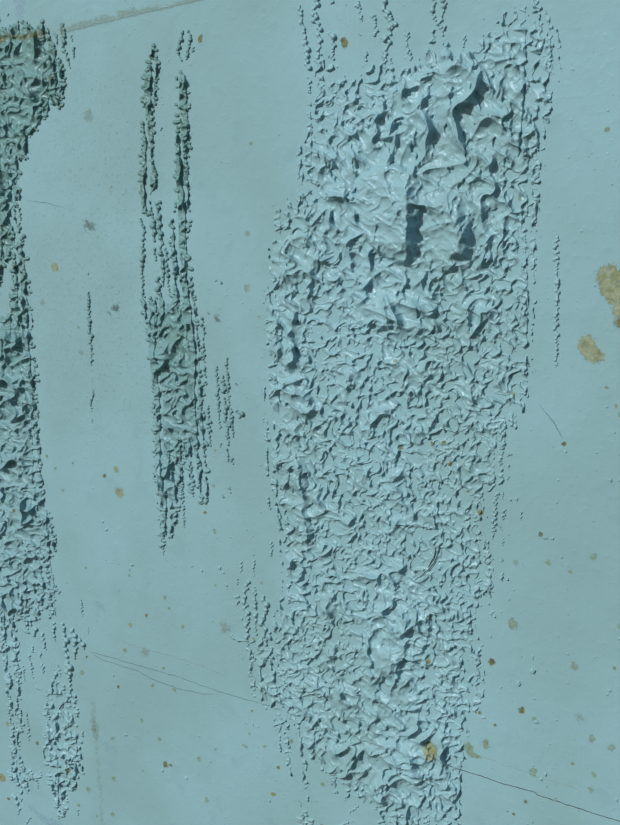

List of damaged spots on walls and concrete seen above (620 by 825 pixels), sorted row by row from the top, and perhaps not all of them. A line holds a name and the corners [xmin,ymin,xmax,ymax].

water stain [596,264,620,327]
water stain [577,334,604,364]
crack [87,639,287,713]
crack [352,733,620,823]